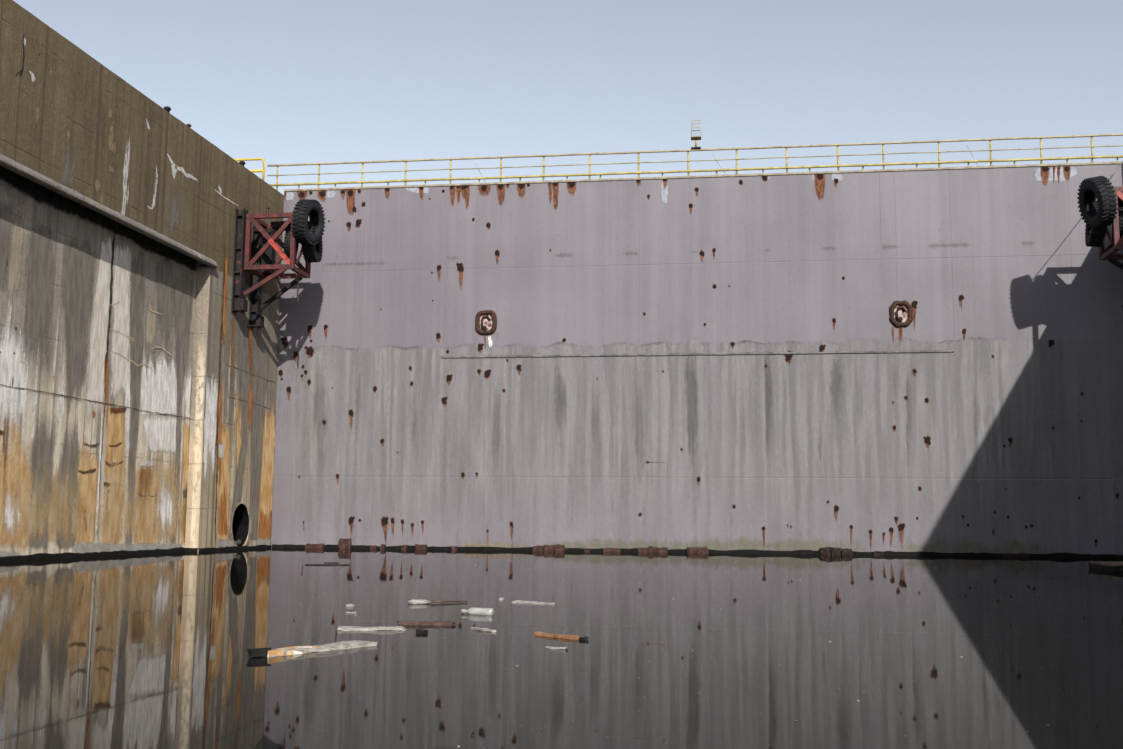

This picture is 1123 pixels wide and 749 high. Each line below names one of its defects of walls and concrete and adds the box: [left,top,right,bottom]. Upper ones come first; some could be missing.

rust [418,184,530,229]
rust [548,182,576,208]
rust [814,174,838,199]
leakage [0,108,222,557]
rust [892,301,918,340]
rust [0,407,190,548]
leakage [219,328,271,547]
rust [217,326,276,540]
leakage [305,335,1011,499]
rust [868,516,918,547]